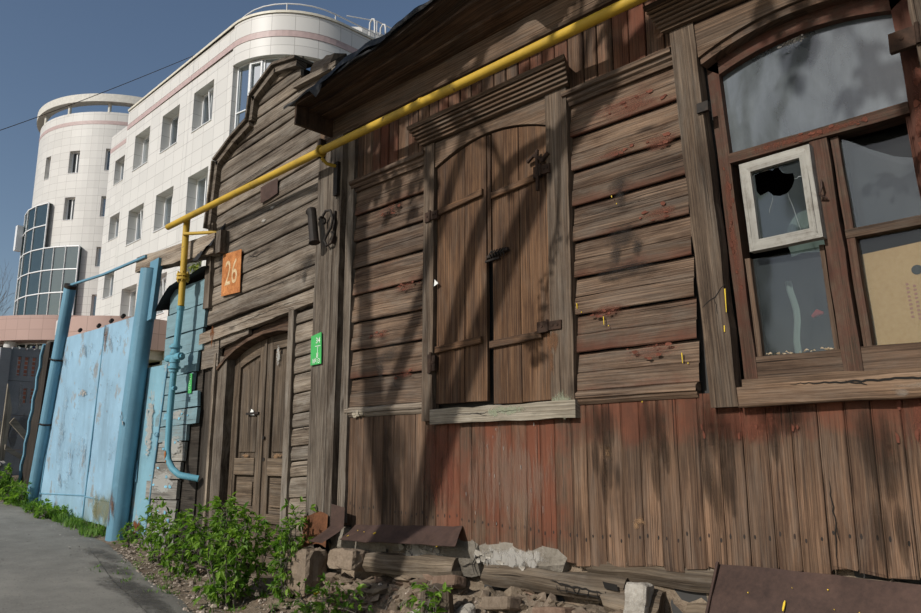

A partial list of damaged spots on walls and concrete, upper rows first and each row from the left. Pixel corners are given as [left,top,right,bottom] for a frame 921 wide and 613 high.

crack [790,376,921,385]
peeling [145,397,188,457]
spalling [474,549,525,571]
corrosion [705,562,921,613]